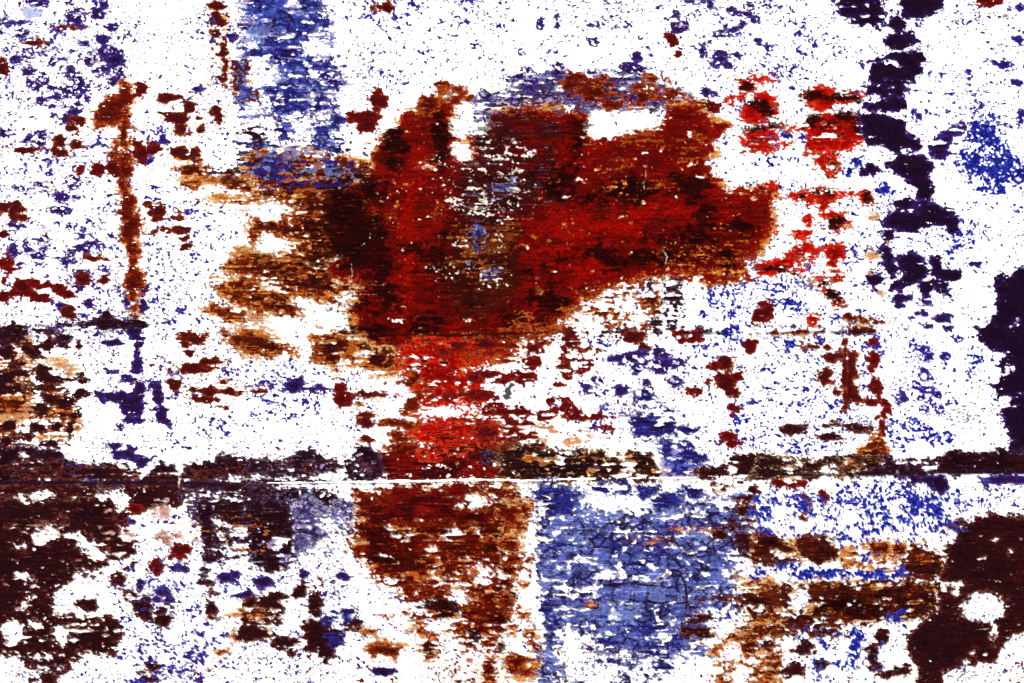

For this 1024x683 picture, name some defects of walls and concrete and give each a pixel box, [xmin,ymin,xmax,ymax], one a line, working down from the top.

rust [738,332,759,358]
rust [712,351,742,401]
crack [570,534,721,609]
rust [557,638,652,683]